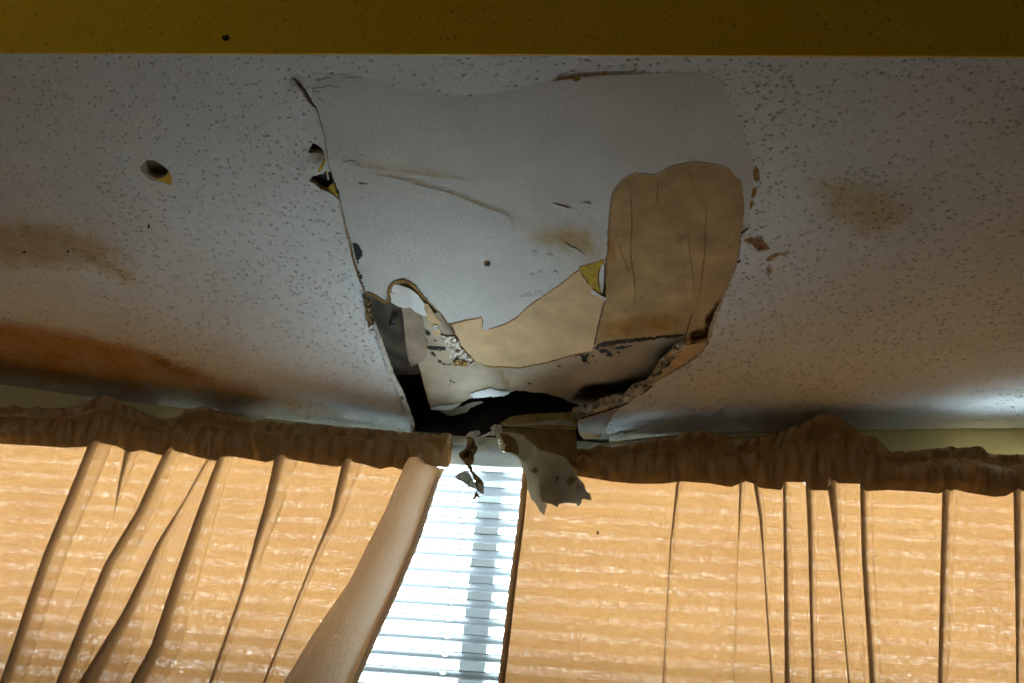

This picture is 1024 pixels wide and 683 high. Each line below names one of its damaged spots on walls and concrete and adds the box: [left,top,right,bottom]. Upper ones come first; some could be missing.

crack [295,77,357,107]
hole [140,160,172,185]
crack [344,219,366,296]
flaking render [309,71,759,443]
leakage [690,302,719,342]